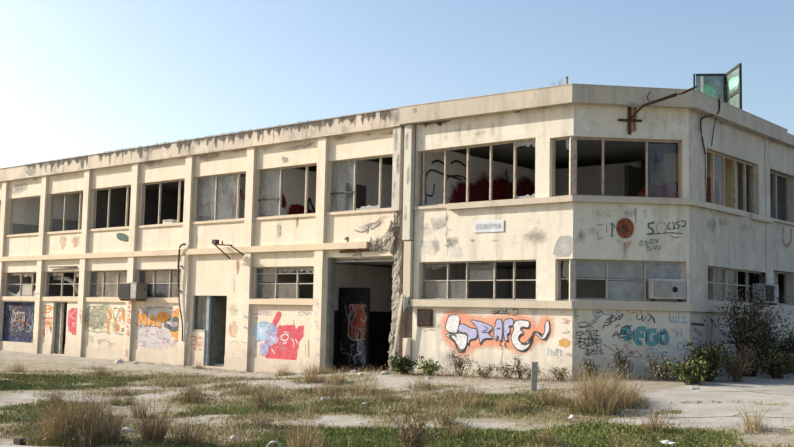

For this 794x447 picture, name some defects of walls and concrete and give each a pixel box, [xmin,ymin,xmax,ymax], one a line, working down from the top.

damp [98,110,393,161]
damp [27,156,88,172]
peeling [554,235,572,257]
spalling [339,210,407,371]